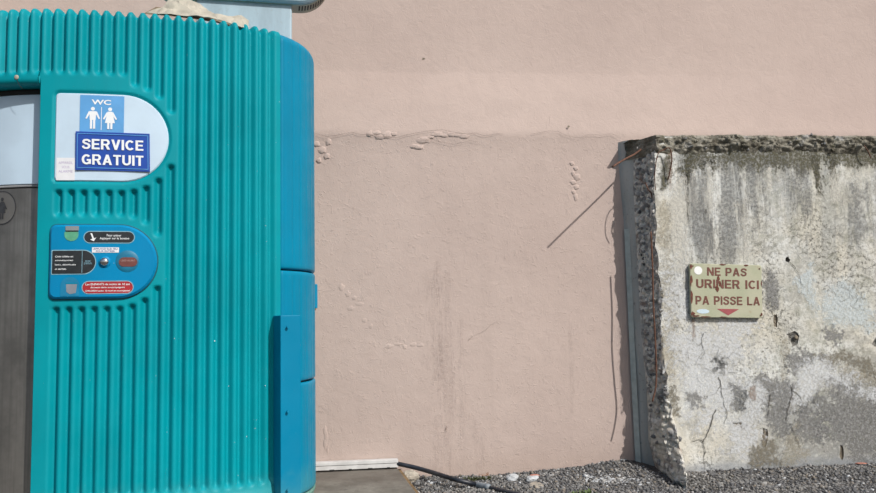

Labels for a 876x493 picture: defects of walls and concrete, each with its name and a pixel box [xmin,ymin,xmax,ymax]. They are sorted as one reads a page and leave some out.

water stain [659,146,876,281]
water stain [762,269,781,311]
water stain [667,385,708,416]
crack [679,333,743,467]
water stain [728,326,876,468]